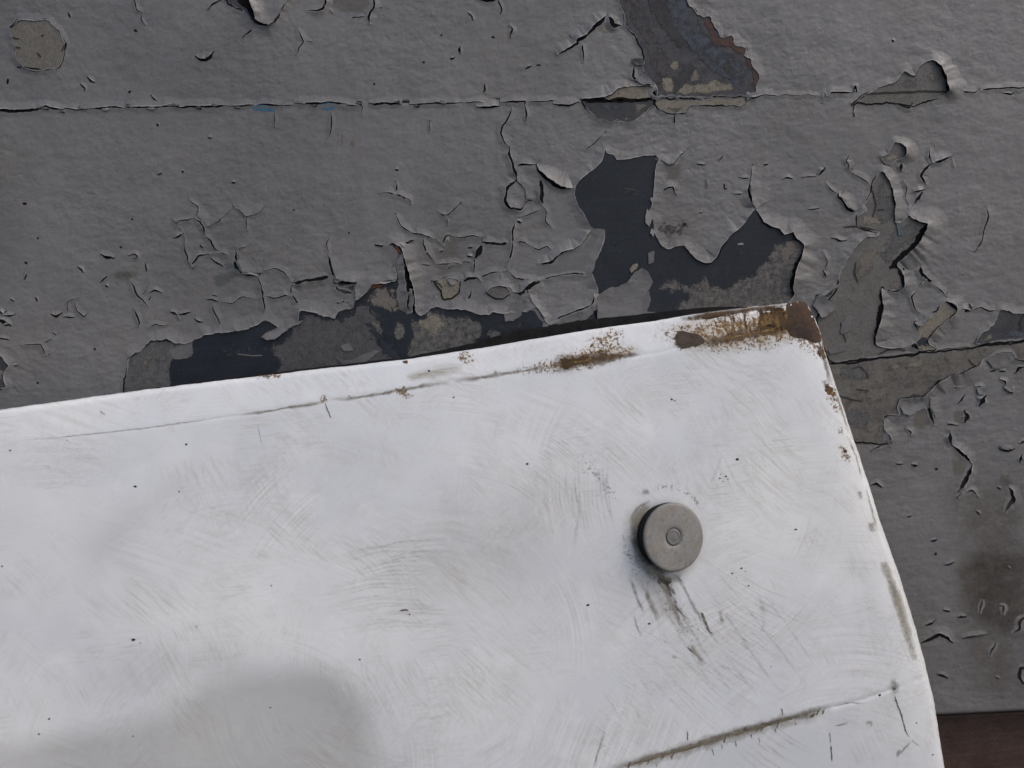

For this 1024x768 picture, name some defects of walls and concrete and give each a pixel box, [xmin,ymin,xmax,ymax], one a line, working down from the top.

peeling [2,13,70,76]
peeling [206,0,297,39]
peeling [576,0,778,130]
peeling [536,162,576,194]
peeling [645,197,655,236]
peeling [118,231,558,393]
peeling [597,251,655,319]
peeling [813,135,1024,454]
corrosion [523,329,633,373]
corrosion [662,302,860,470]
peeling [999,437,1024,463]
peeling [1012,662,1024,689]